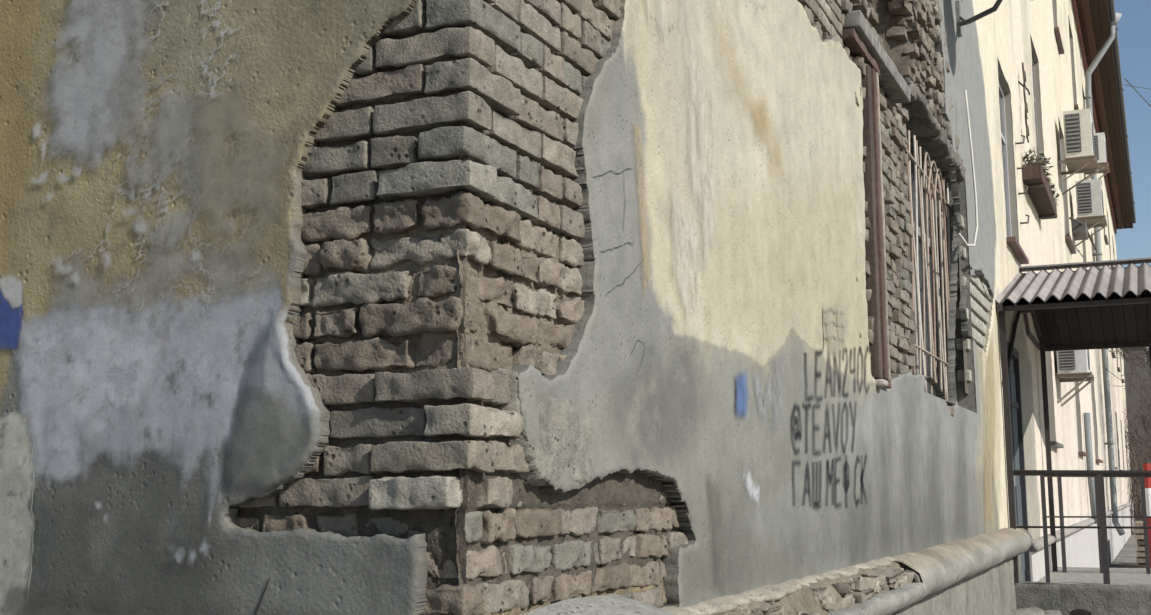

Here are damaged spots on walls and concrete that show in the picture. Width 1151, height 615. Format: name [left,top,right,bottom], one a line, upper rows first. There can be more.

peeling [33,0,289,339]
peeling [0,276,23,349]
spalling [236,0,688,615]
peeling [0,413,35,615]
spalling [737,565,920,615]